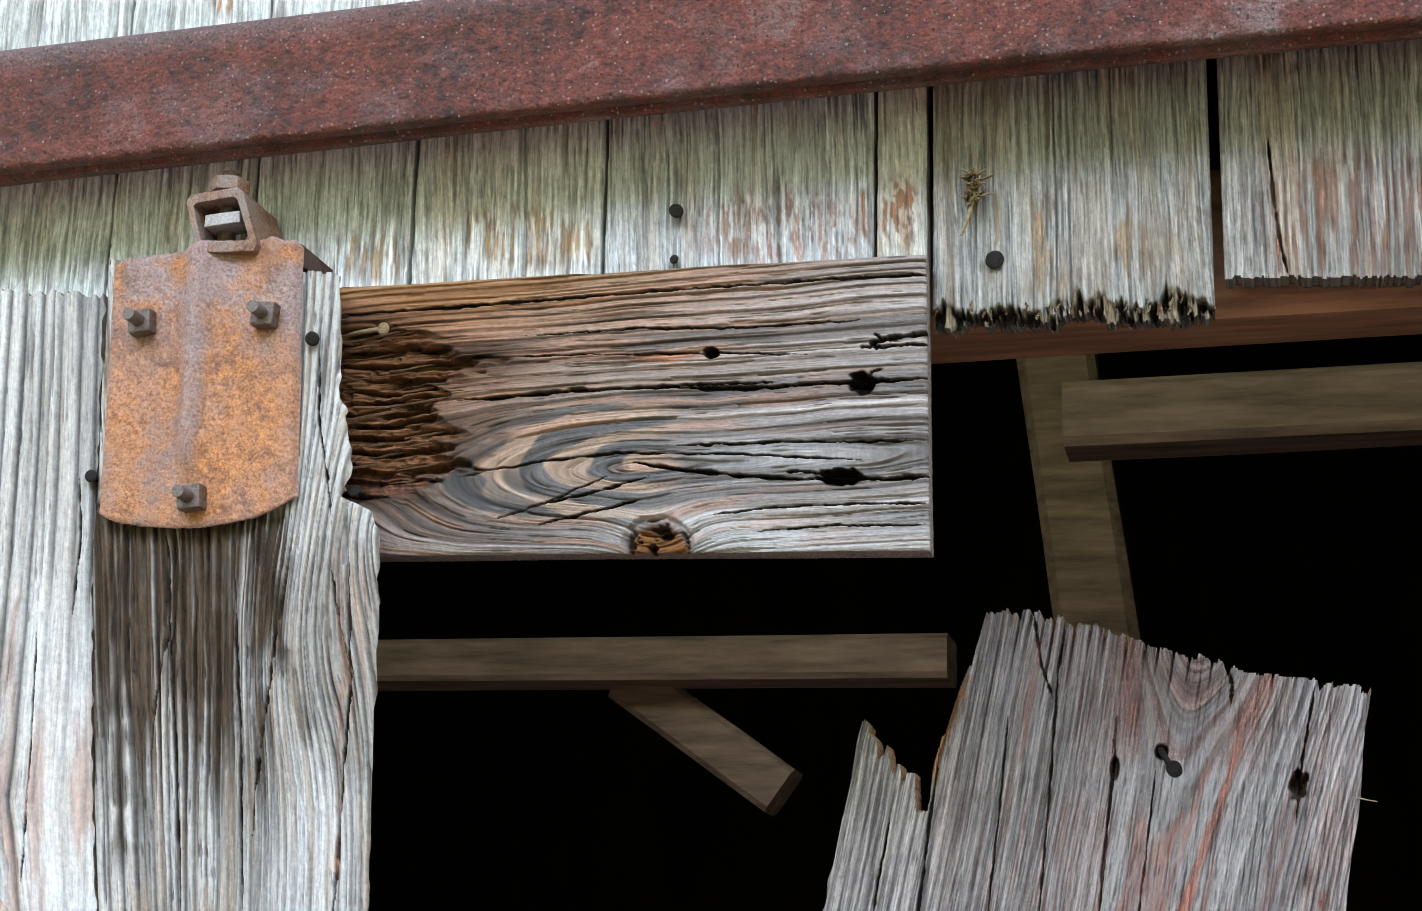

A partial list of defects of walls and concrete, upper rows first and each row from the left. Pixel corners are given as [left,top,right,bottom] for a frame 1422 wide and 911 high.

corrosion [721,197,835,256]
corrosion [883,182,915,238]
corrosion [1032,205,1050,283]
corrosion [1117,215,1147,269]
corrosion [1274,158,1422,274]
crack [342,273,927,401]
crack [466,440,930,532]
crack [1034,617,1065,911]